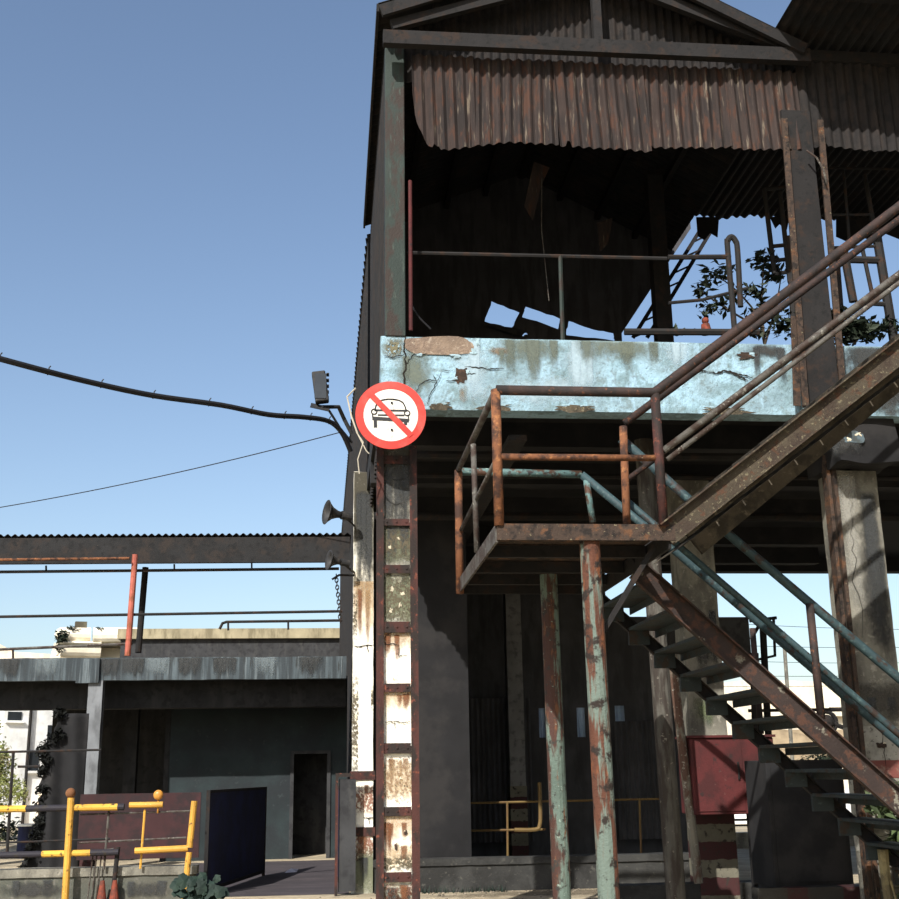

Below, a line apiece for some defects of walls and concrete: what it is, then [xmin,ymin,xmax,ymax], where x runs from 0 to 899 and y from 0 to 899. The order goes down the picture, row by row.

spalling [384,336,480,384]
crack [388,336,504,404]
leakage [460,341,485,393]
leakage [490,339,557,373]
leakage [518,341,658,401]
leakage [670,343,687,362]
crack [699,370,753,380]
rust [384,632,411,656]
rust [384,692,411,707]
rust [384,758,411,795]
leakage [358,836,368,880]
rust [384,815,412,863]